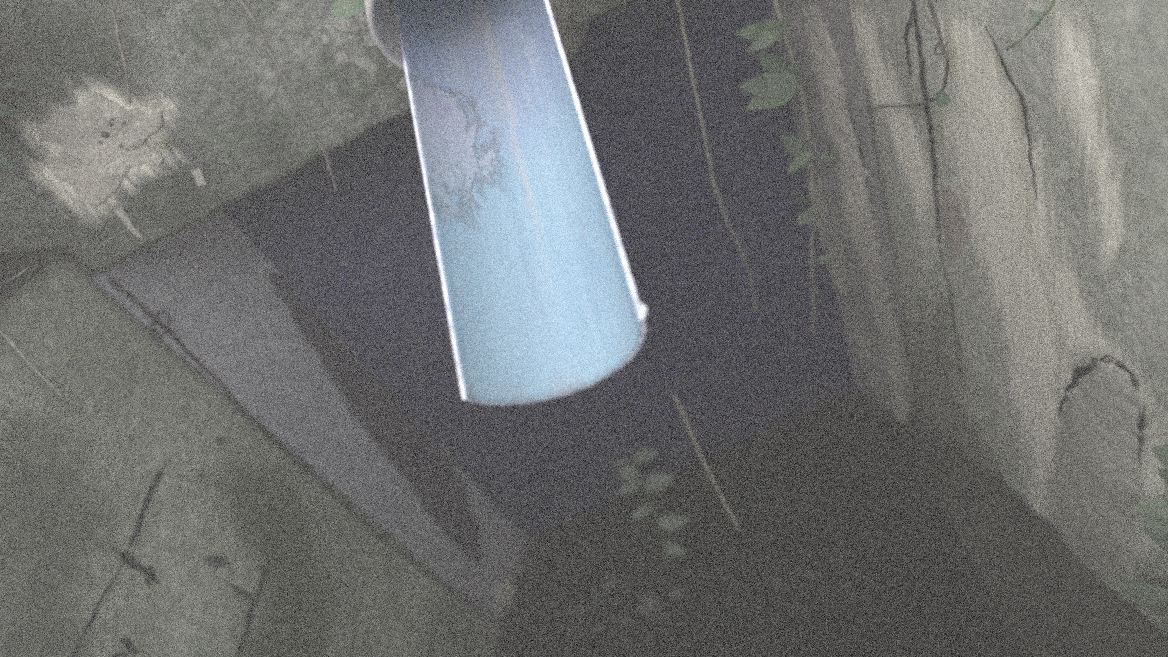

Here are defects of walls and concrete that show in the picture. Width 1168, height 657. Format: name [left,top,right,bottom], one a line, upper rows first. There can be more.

crack [984,25,1038,200]